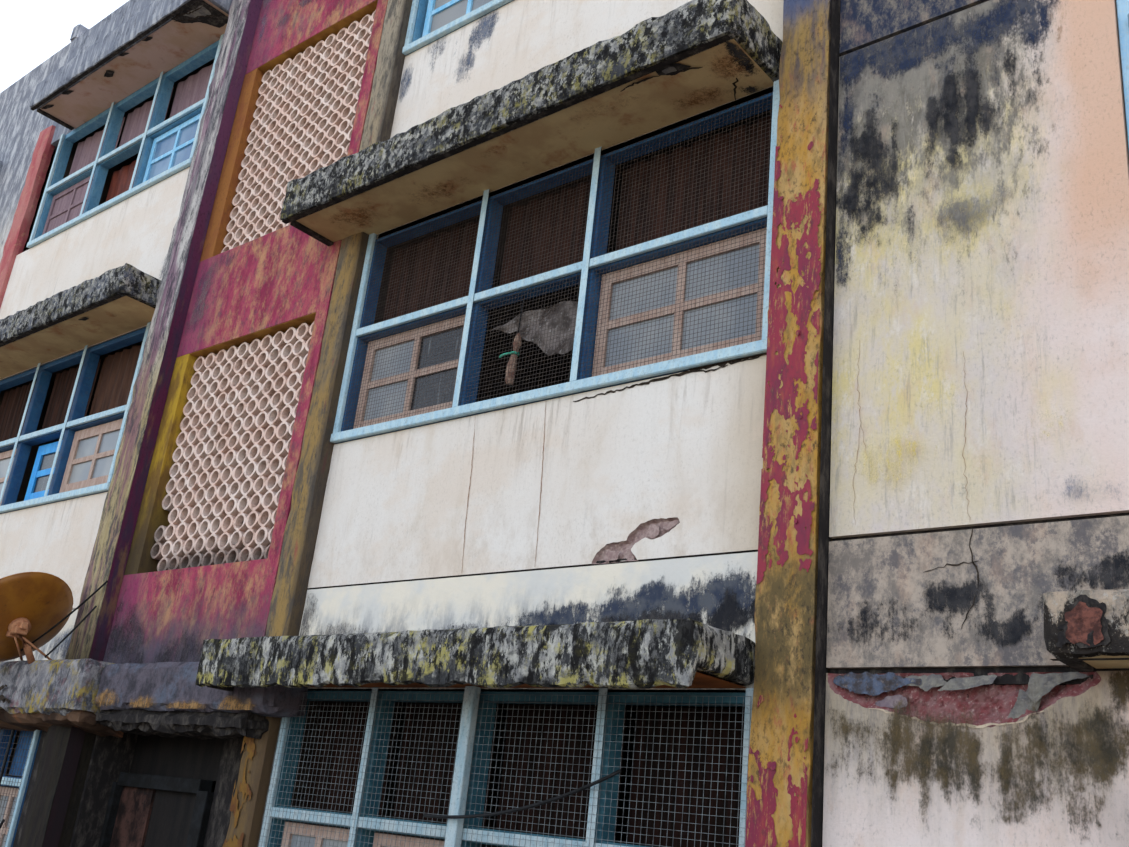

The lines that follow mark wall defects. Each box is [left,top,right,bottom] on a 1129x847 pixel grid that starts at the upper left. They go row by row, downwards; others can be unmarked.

water stain [836,0,1059,286]
peeling [756,146,822,585]
spalling [592,517,680,564]
water stain [601,589,755,637]
water stain [828,580,1044,647]
crack [925,351,979,629]
spalling [1055,595,1110,648]
water stain [1055,551,1129,590]
spalling [95,709,269,847]
peeling [745,713,808,847]
spalling [828,671,1101,728]
water stain [831,671,1129,839]